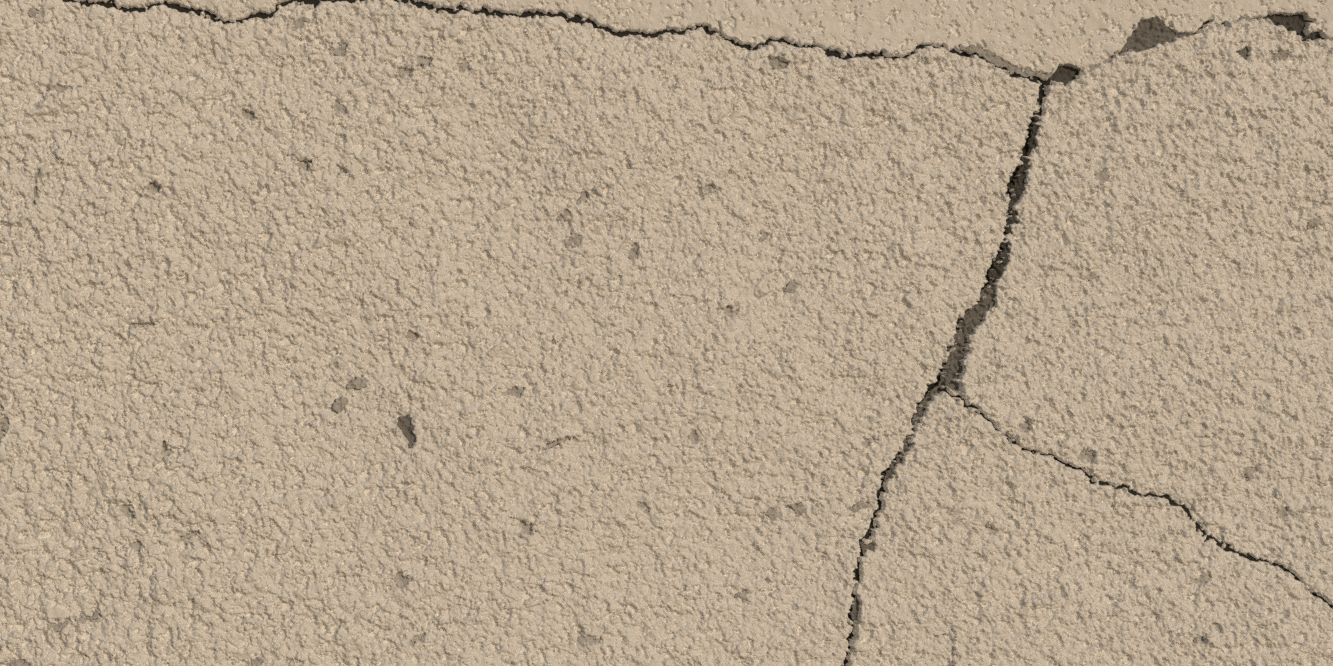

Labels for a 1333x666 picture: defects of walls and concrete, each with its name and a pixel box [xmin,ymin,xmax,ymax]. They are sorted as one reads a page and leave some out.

crack [62,0,364,24]
crack [32,169,40,205]
crack [394,0,1333,666]